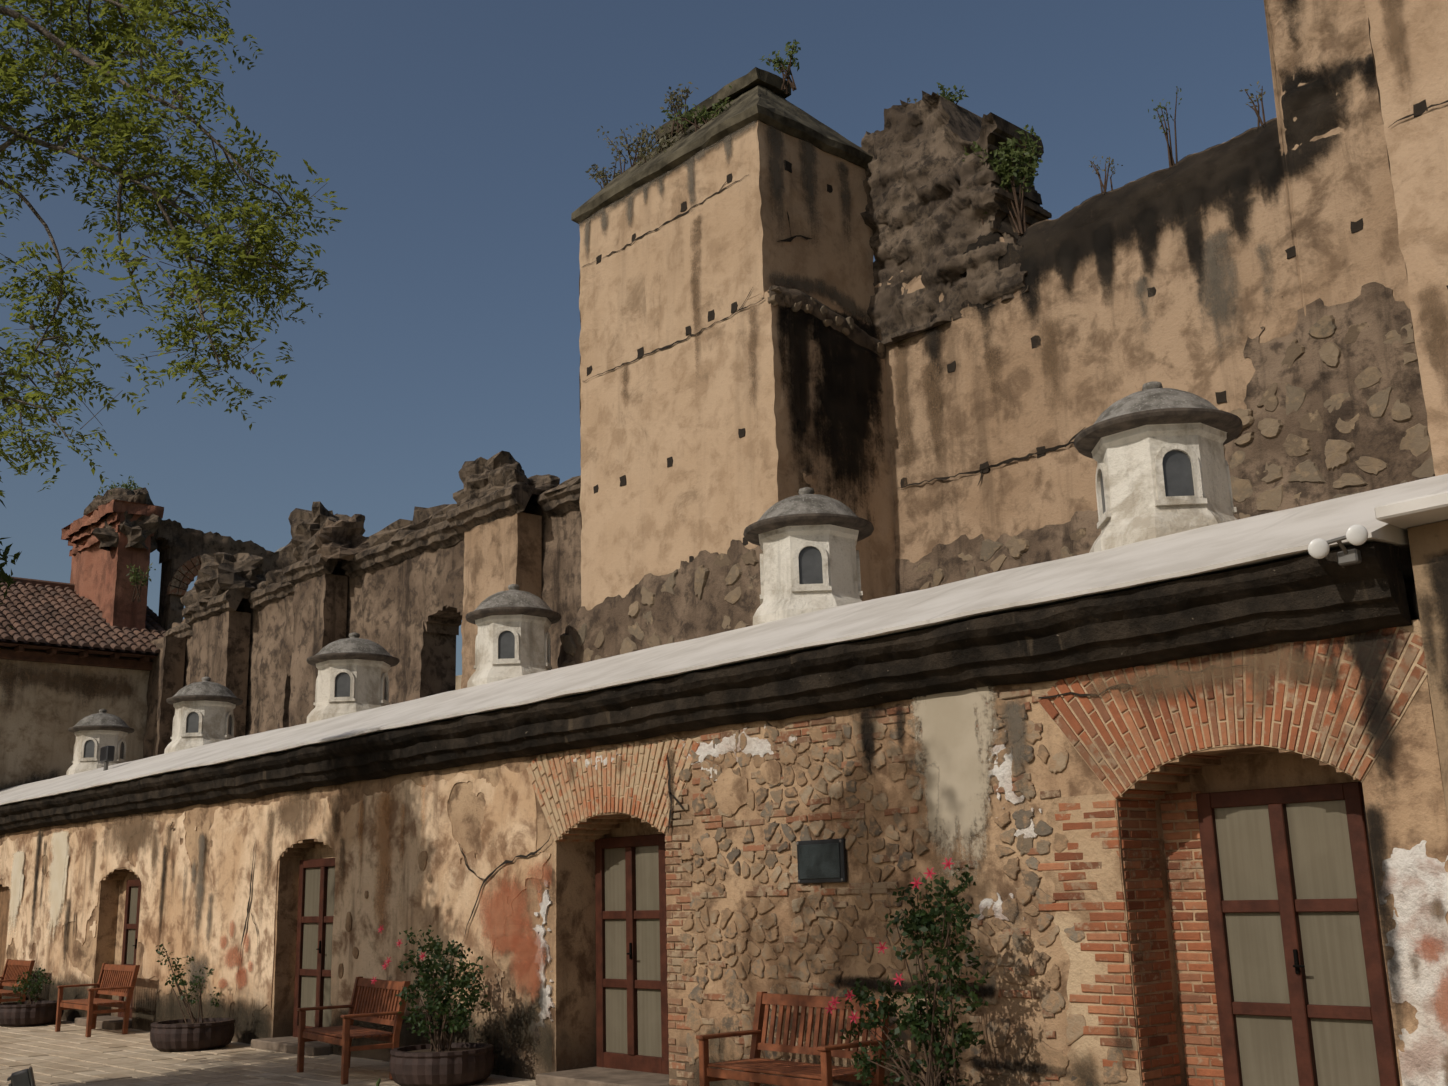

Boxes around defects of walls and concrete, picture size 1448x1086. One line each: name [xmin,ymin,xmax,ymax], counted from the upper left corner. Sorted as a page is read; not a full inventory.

water stain [579,121,817,349]
water stain [962,0,1407,387]
water stain [770,274,913,504]
water stain [923,314,942,451]
flaking render [1221,282,1435,520]
water stain [1419,287,1448,393]
water stain [1419,551,1448,693]
peeling [573,754,621,770]
flaking render [683,724,798,814]
crack [459,834,551,937]
flaking render [483,880,555,1073]
peeling [1384,840,1448,1086]